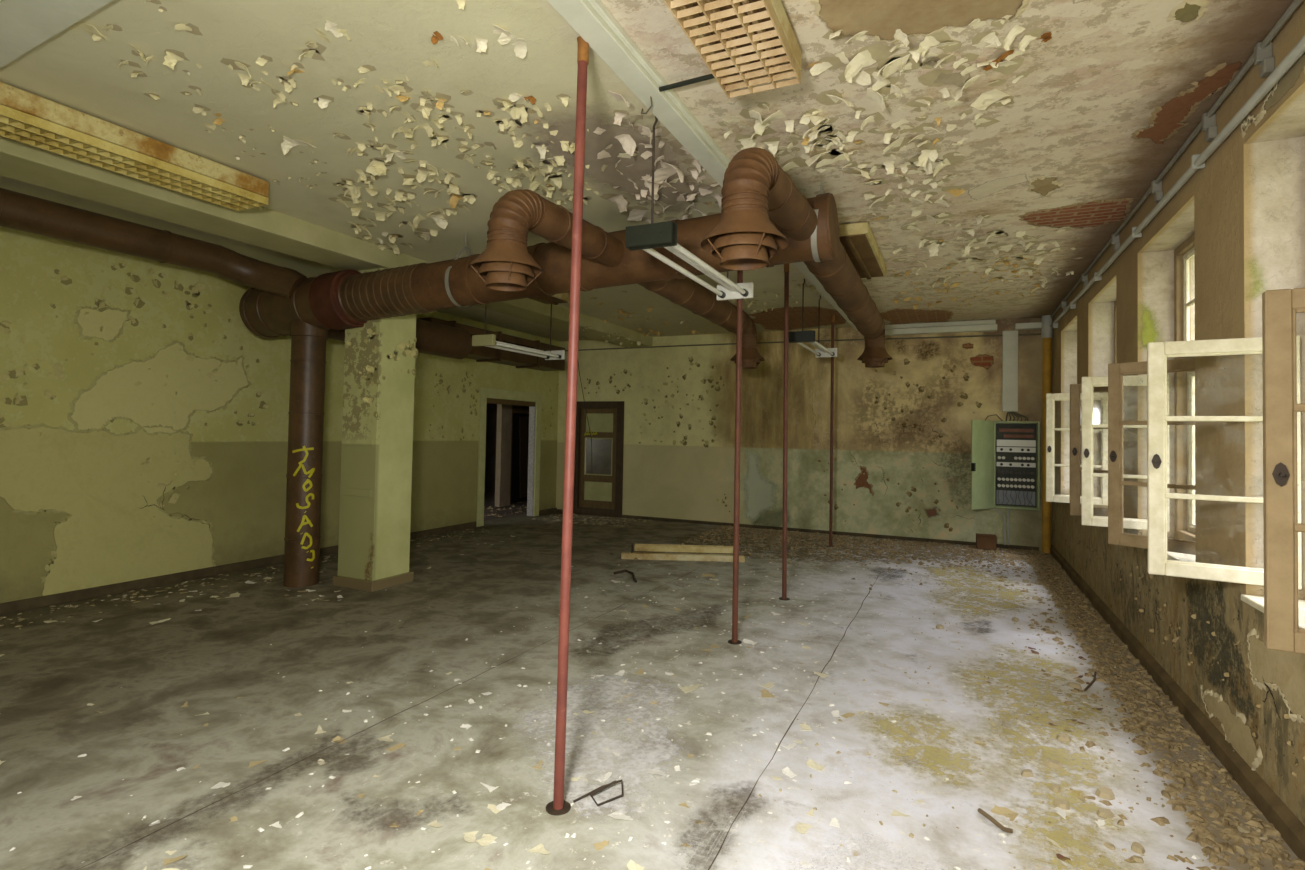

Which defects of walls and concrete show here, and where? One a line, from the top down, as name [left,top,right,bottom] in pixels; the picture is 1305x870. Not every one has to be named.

flaking render [1166,0,1210,22]
peeling [66,20,722,255]
flaking render [718,0,1134,331]
flaking render [1131,61,1241,144]
peeling [0,359,216,596]
flaking render [816,457,917,522]
leakage [1186,582,1254,717]